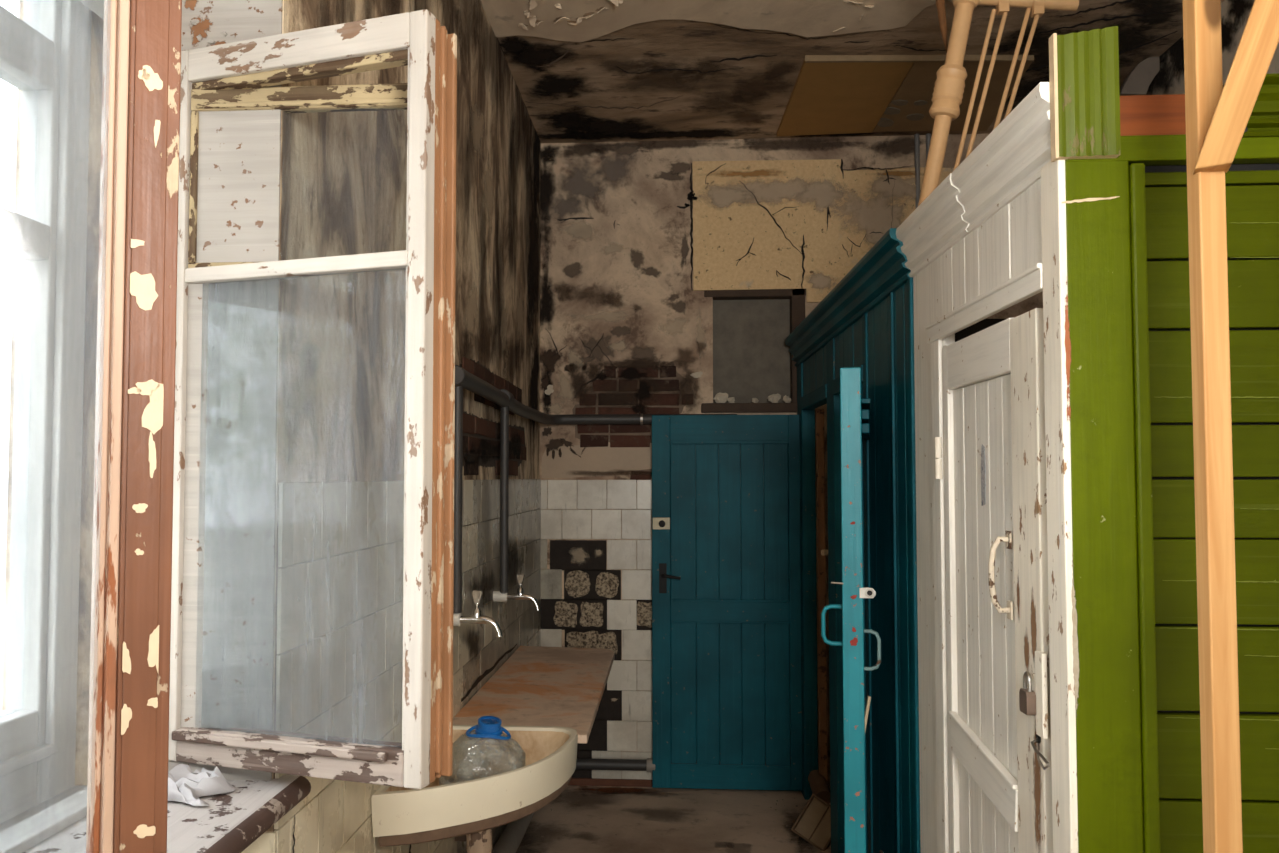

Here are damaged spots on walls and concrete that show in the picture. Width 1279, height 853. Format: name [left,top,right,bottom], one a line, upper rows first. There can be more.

water stain [321,0,350,27]
water stain [390,0,426,12]
peeling [138,65,163,91]
water stain [442,0,922,459]
crack [677,159,909,289]
peeling [130,271,158,311]
peeling [128,380,164,478]
spalling [545,351,703,447]
peeling [132,503,148,513]
peeling [540,540,621,660]
peeling [637,600,652,630]
peeling [571,683,623,778]